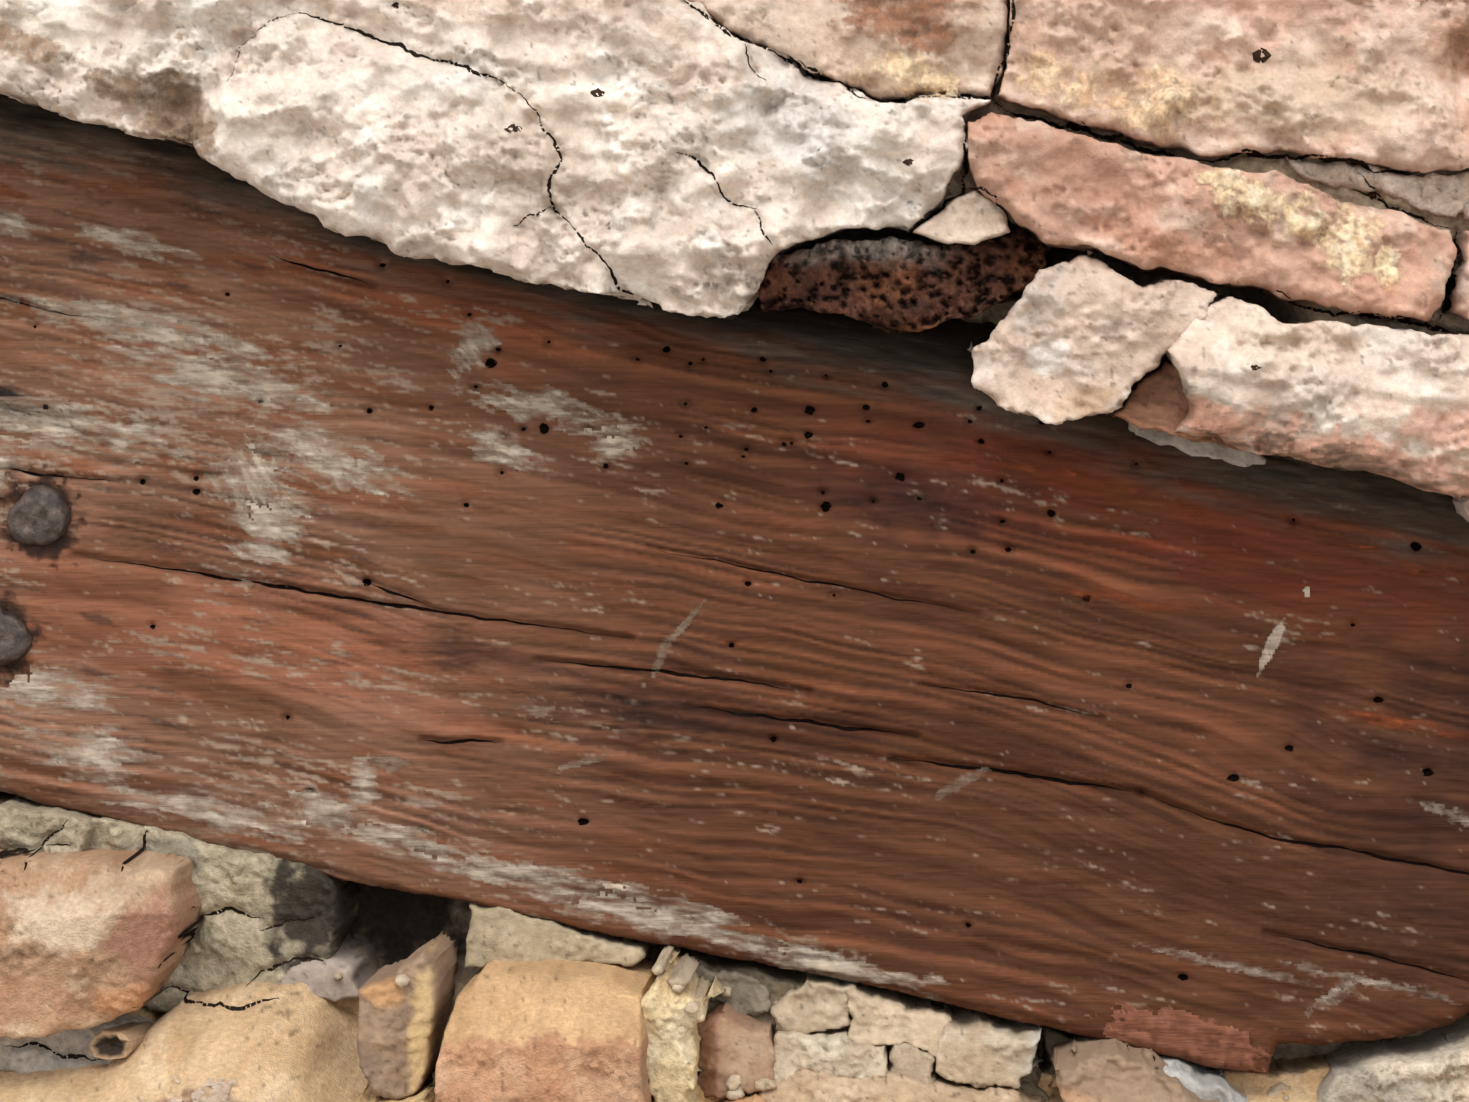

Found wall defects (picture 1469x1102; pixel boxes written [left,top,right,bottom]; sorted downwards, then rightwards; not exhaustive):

crack [227,12,654,309]
rust [0,471,87,567]
rust [0,592,40,639]
rust [1,656,30,684]
crack [82,550,1469,875]